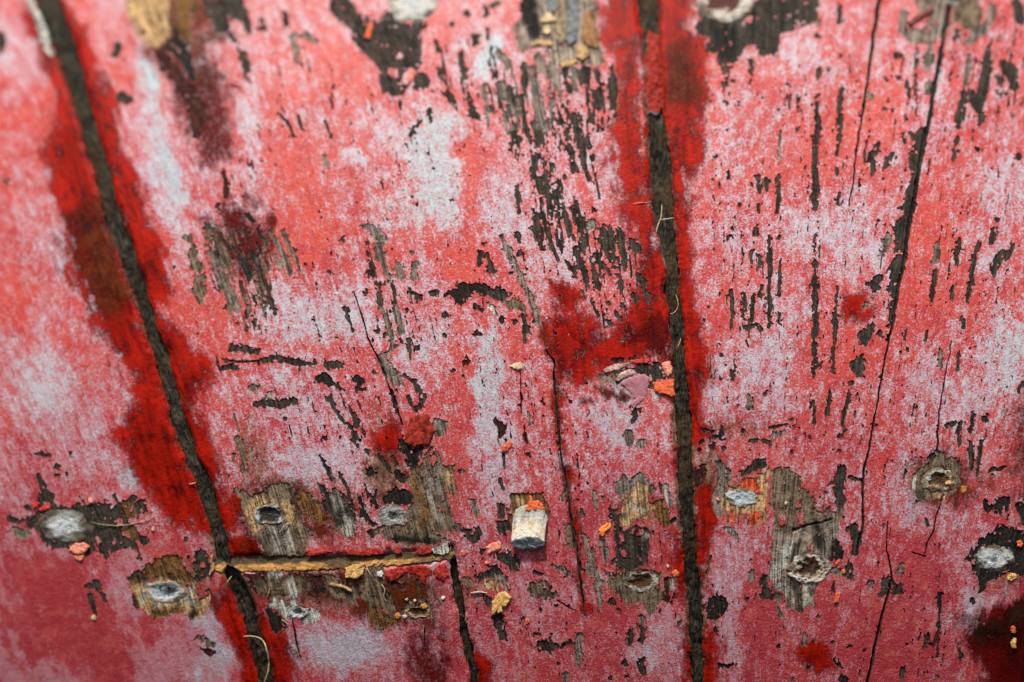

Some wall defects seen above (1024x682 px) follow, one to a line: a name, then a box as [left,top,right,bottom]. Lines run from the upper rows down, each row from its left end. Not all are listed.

peeling [5,450,211,621]
peeling [181,0,682,682]
crack [545,348,586,616]
peeling [692,0,1024,682]
crack [848,0,882,206]
crack [856,5,951,682]